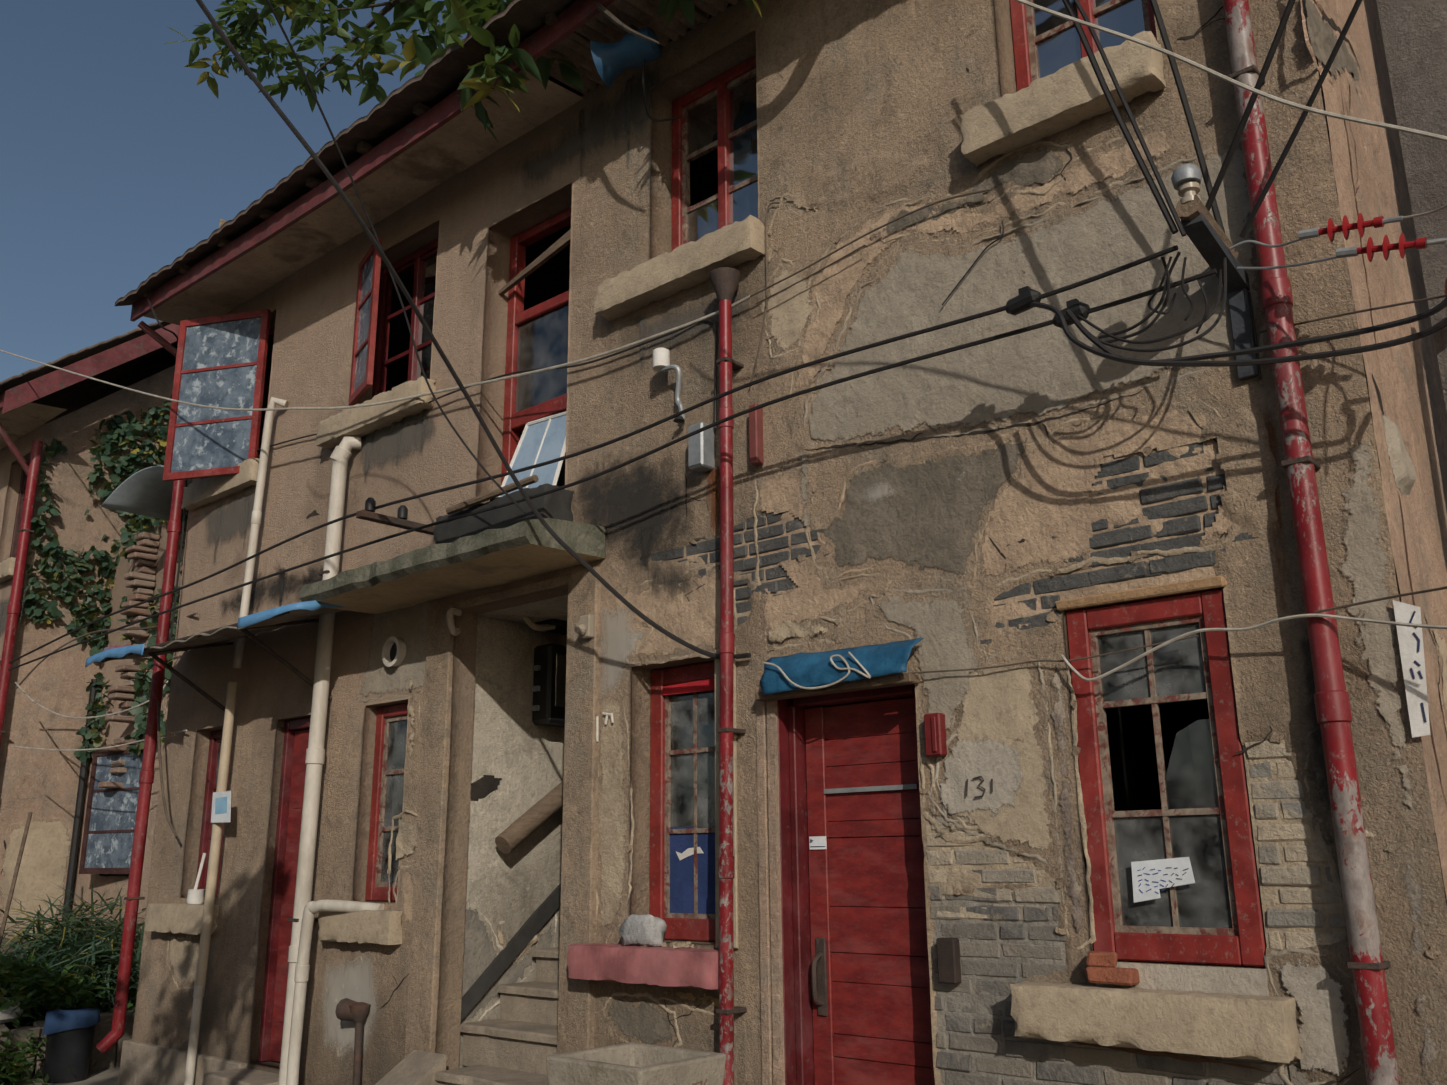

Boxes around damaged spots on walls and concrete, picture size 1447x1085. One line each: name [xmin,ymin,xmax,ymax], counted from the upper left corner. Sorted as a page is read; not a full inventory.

crack [1314,0,1385,415]
peeling [603,116,1310,1085]
flaking render [1243,728,1346,950]
peeling [1338,441,1420,807]
peeling [1423,612,1447,728]